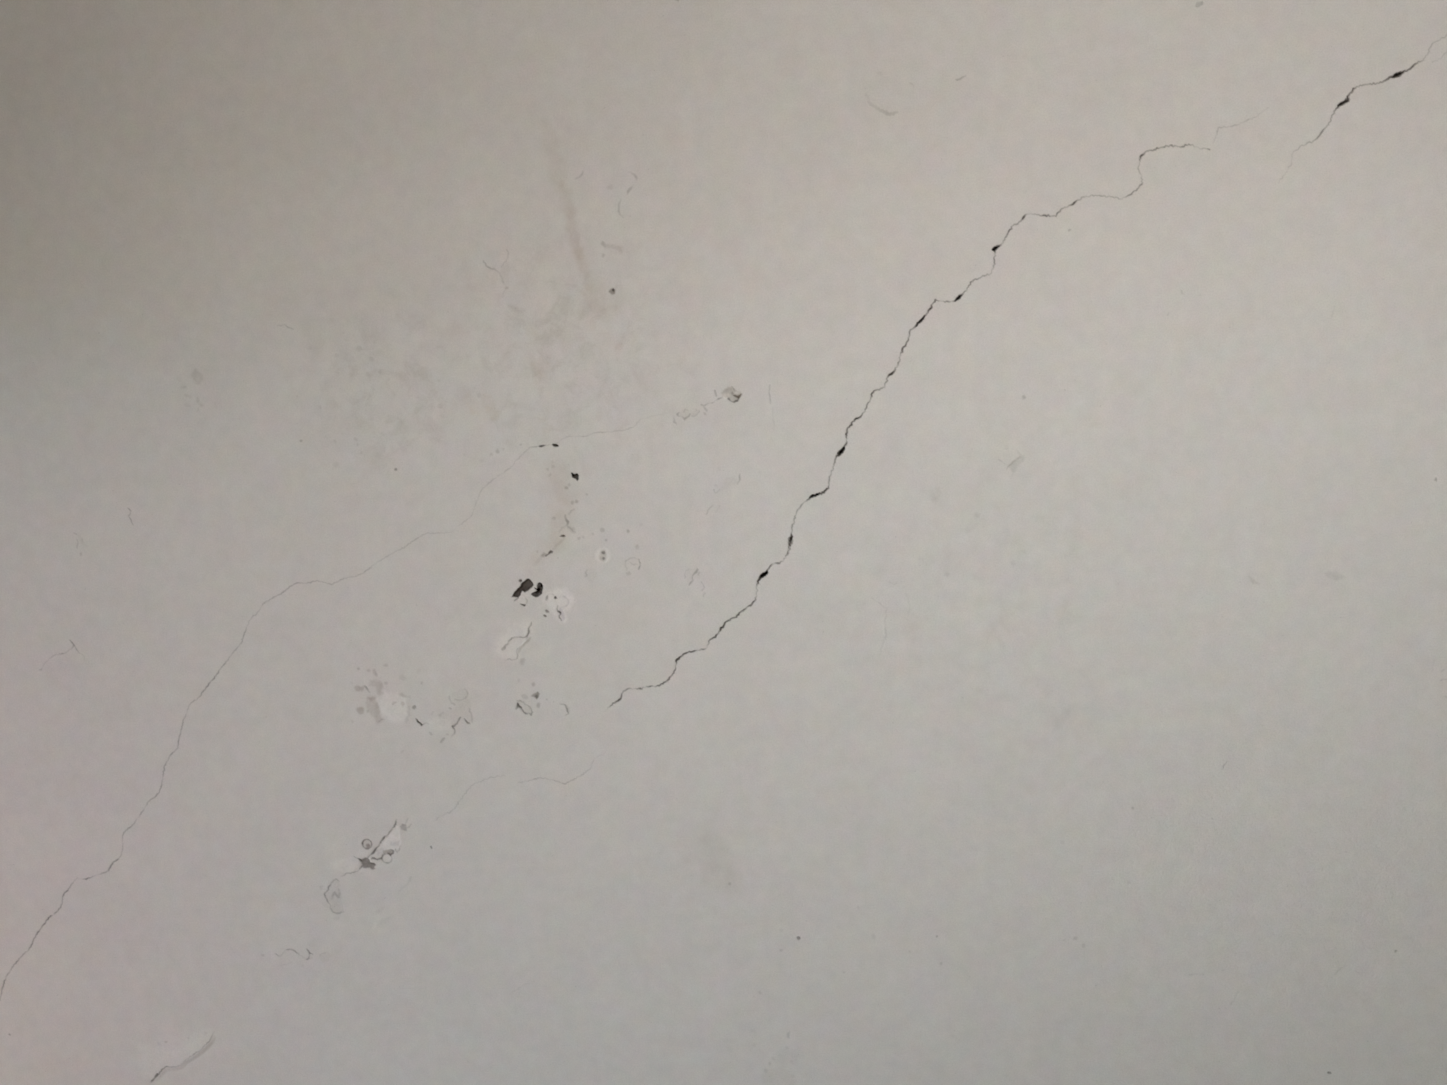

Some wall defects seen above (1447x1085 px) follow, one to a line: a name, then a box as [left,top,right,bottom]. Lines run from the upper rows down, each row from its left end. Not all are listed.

crack [1277,32,1447,184]
crack [603,106,1270,712]
flaking render [505,574,554,613]
crack [0,412,667,1002]
flaking render [514,677,571,717]
flaking render [326,816,413,878]